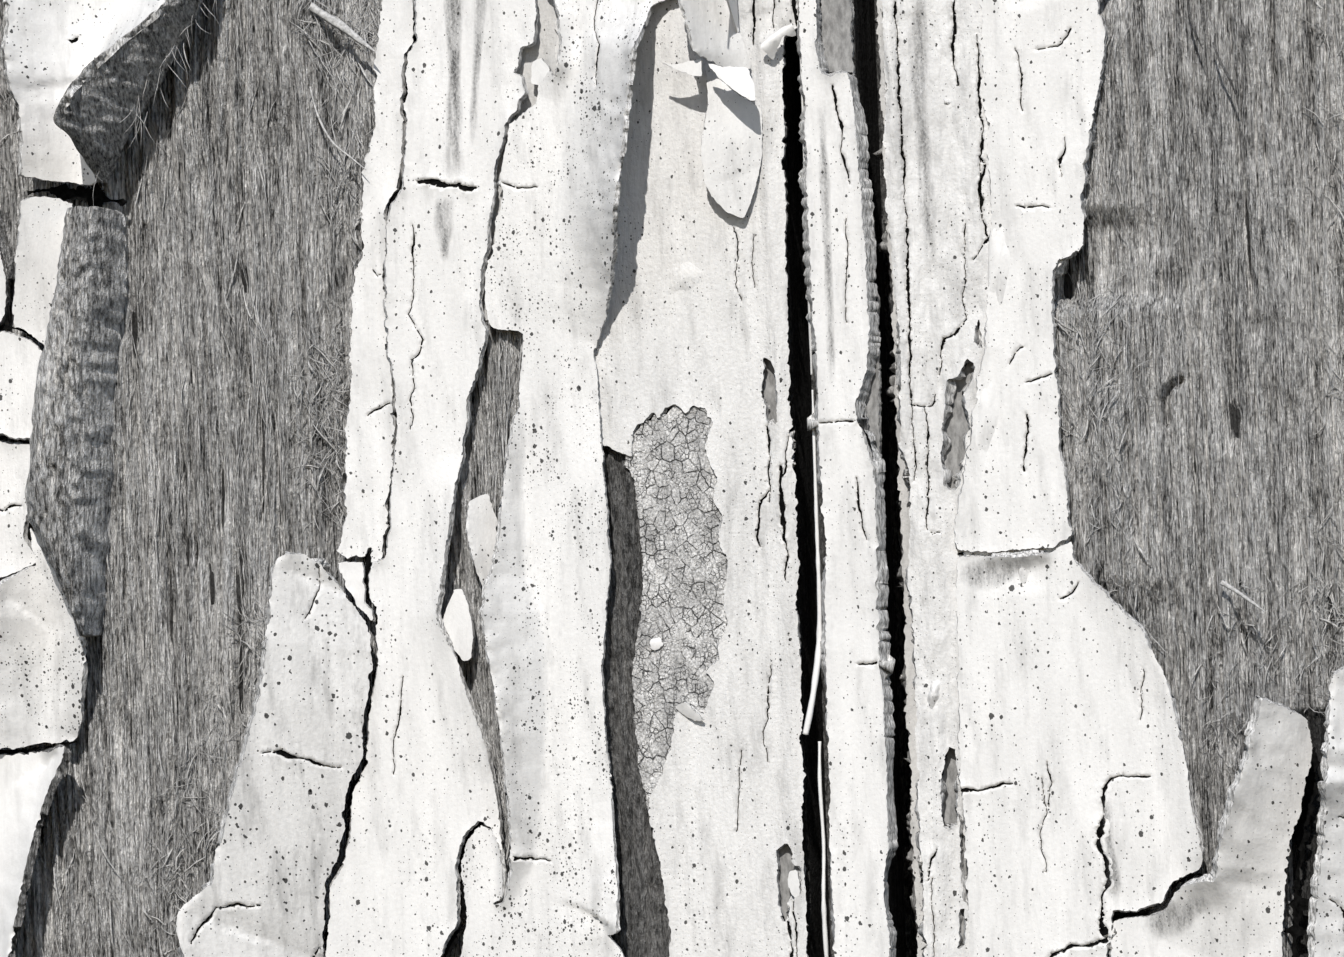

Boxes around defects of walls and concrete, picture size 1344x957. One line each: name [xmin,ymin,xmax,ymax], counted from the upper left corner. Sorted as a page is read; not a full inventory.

peeling [662,0,796,218]
crack [832,85,850,183]
crack [367,179,536,429]
crack [842,218,850,322]
peeling [0,0,389,957]
crack [819,420,873,540]
peeling [1054,0,1344,957]
peeling [441,321,523,878]
peeling [443,885,467,957]
crack [928,849,937,954]
crack [961,766,1052,871]
crack [1050,775,1211,957]